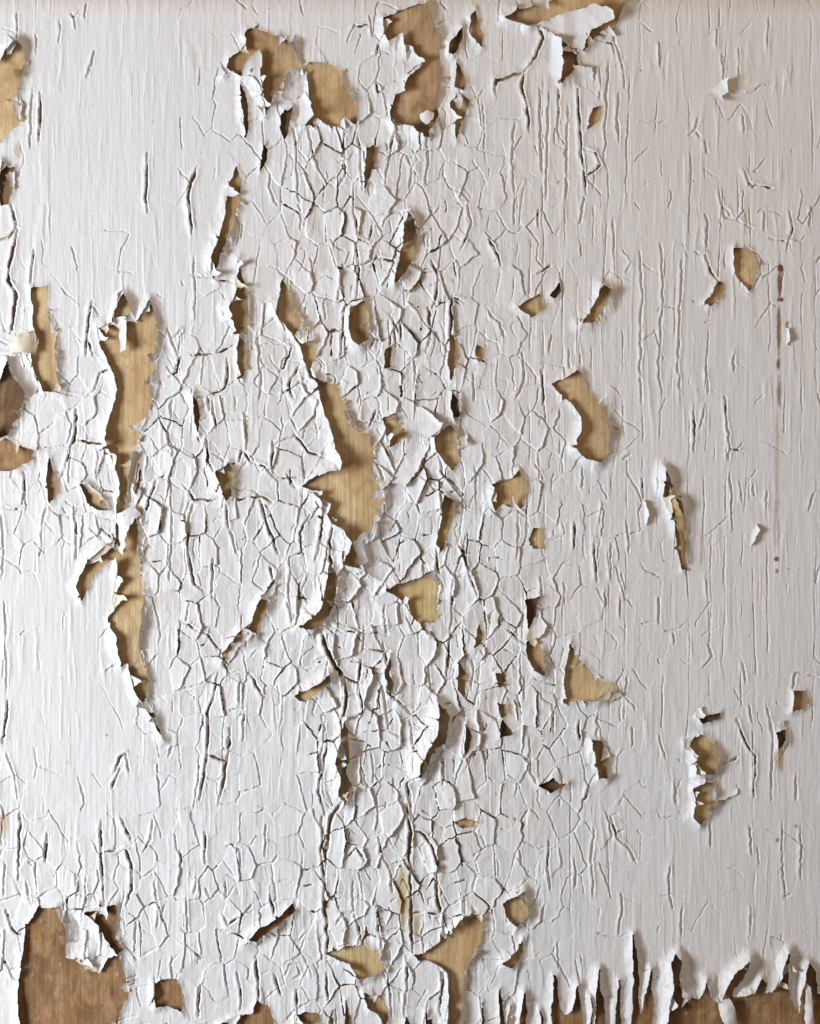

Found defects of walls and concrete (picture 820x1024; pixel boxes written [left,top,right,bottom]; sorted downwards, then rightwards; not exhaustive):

peeling [0,31,38,214]
crack [310,1,391,143]
peeling [0,275,173,749]
crack [0,33,649,1024]
peeling [201,0,638,646]
crack [637,180,755,444]
crack [639,313,770,731]
crack [747,256,820,513]
peeling [489,591,631,743]
crack [721,542,791,803]
peeling [8,893,193,1024]
peeling [209,881,820,1024]